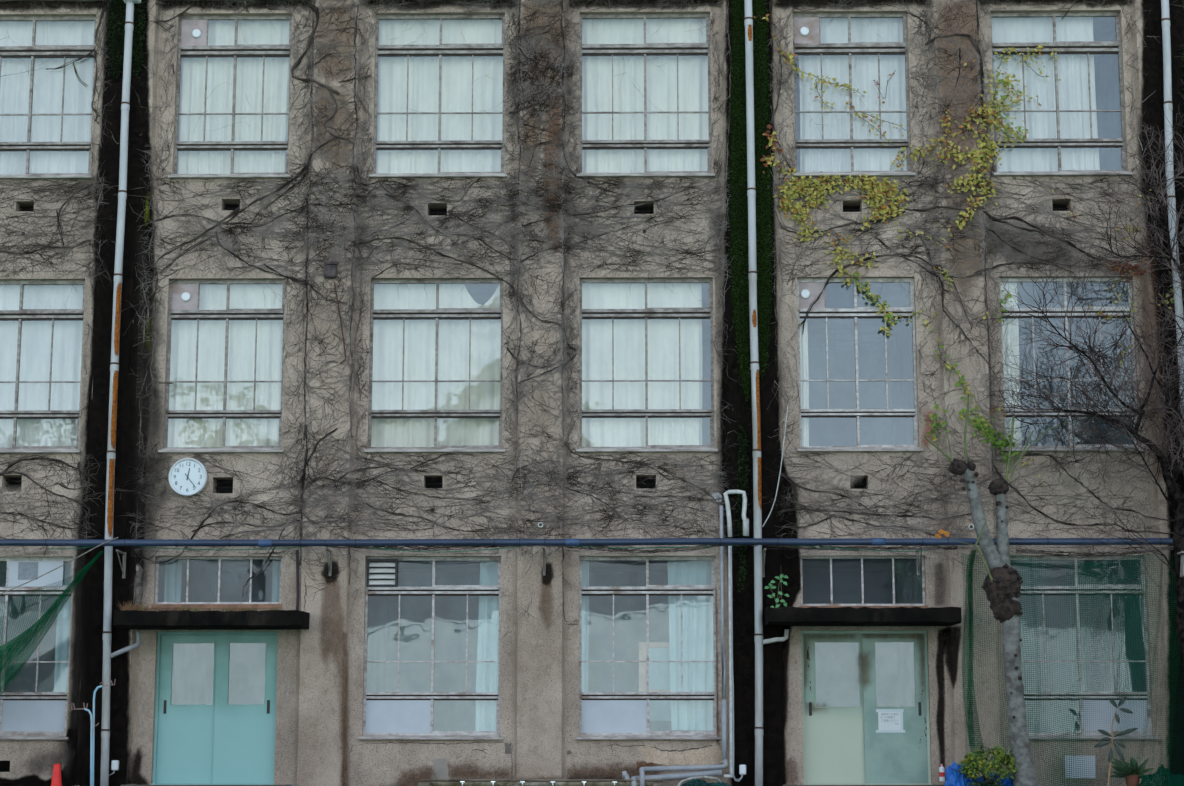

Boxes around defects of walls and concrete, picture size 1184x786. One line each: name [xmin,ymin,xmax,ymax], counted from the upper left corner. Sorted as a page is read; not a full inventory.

water stain [980,0,1184,783]